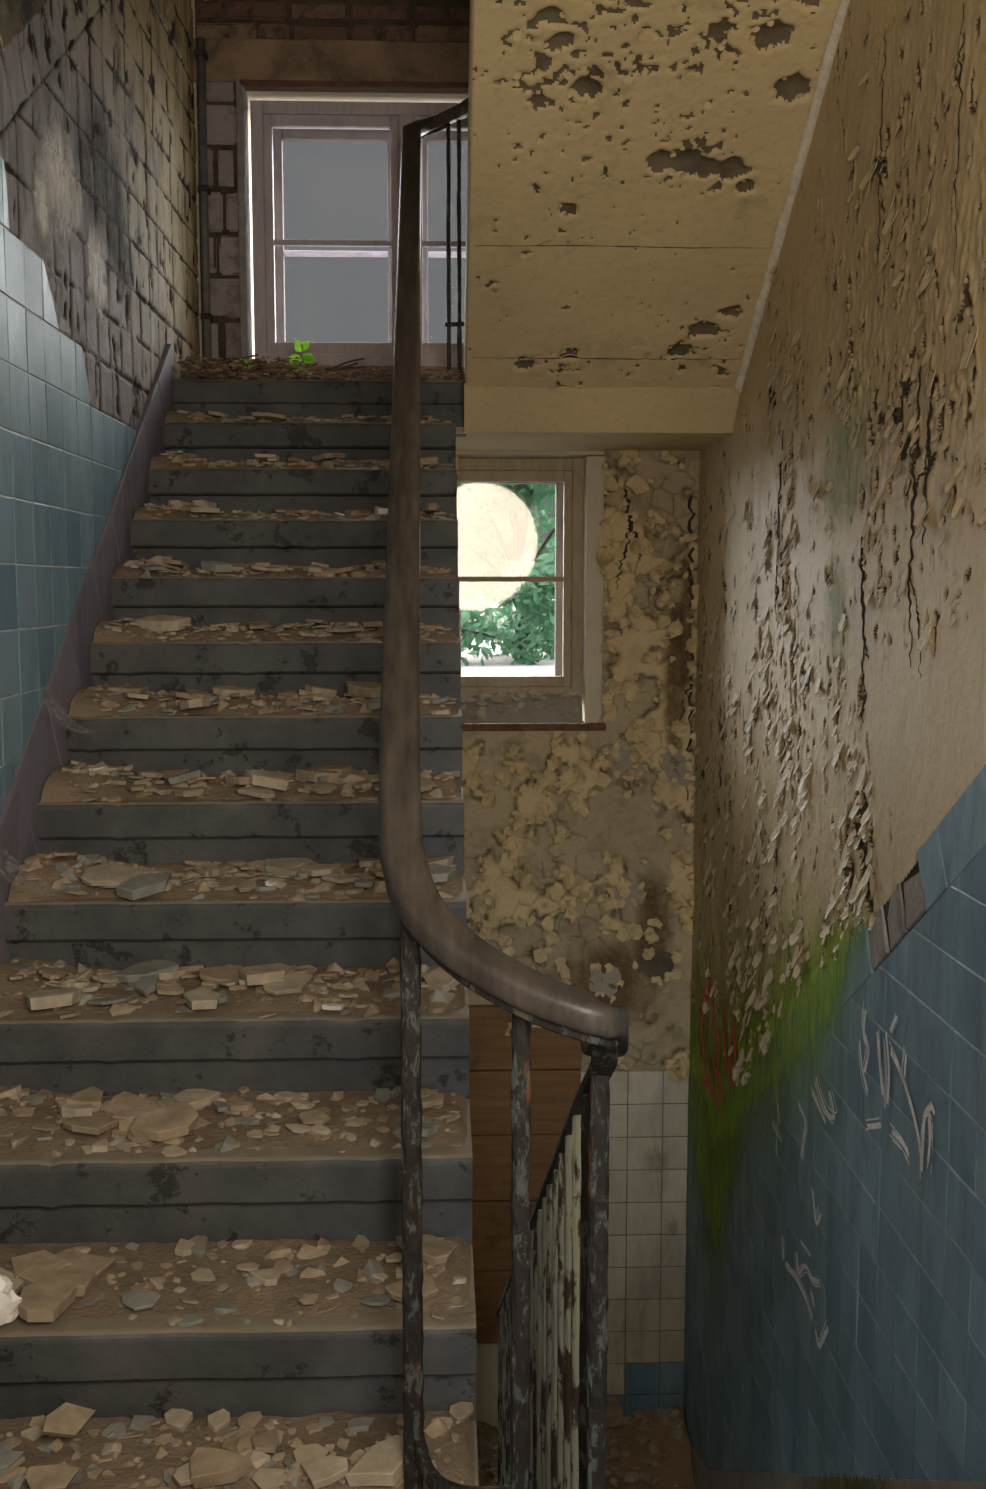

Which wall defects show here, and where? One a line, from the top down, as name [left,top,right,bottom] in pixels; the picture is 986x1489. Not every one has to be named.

peeling [0,0,470,430]
flaking render [420,0,986,1086]
damp [689,929,857,1159]